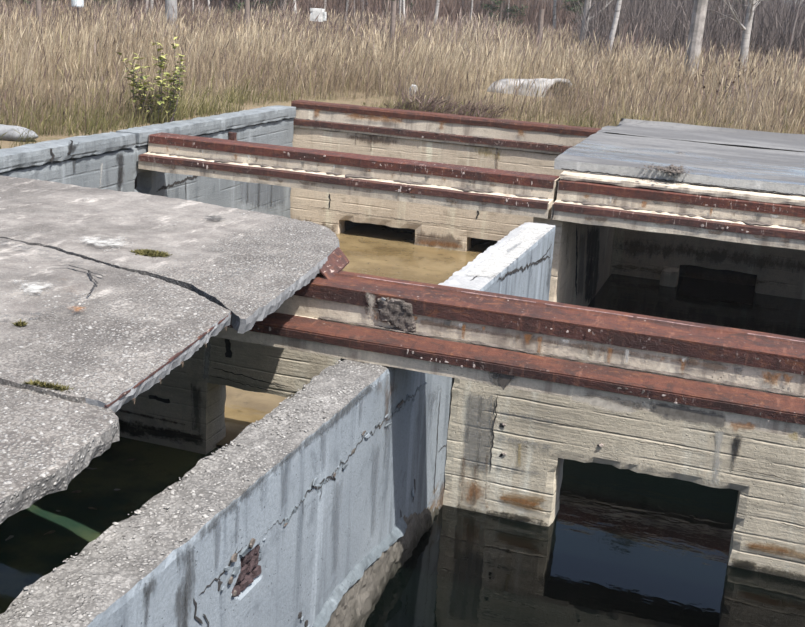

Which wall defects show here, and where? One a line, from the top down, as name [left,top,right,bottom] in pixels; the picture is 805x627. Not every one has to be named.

crack [156,175,197,192]
crack [472,244,552,281]
spalling [368,296,416,334]
water stain [119,384,203,445]
spalling [251,382,362,438]
water stain [272,386,372,471]
crack [263,382,447,541]
spalling [4,439,268,625]
water stain [204,477,265,533]
rust [501,494,543,510]
rust [749,544,805,559]
crack [194,549,242,627]